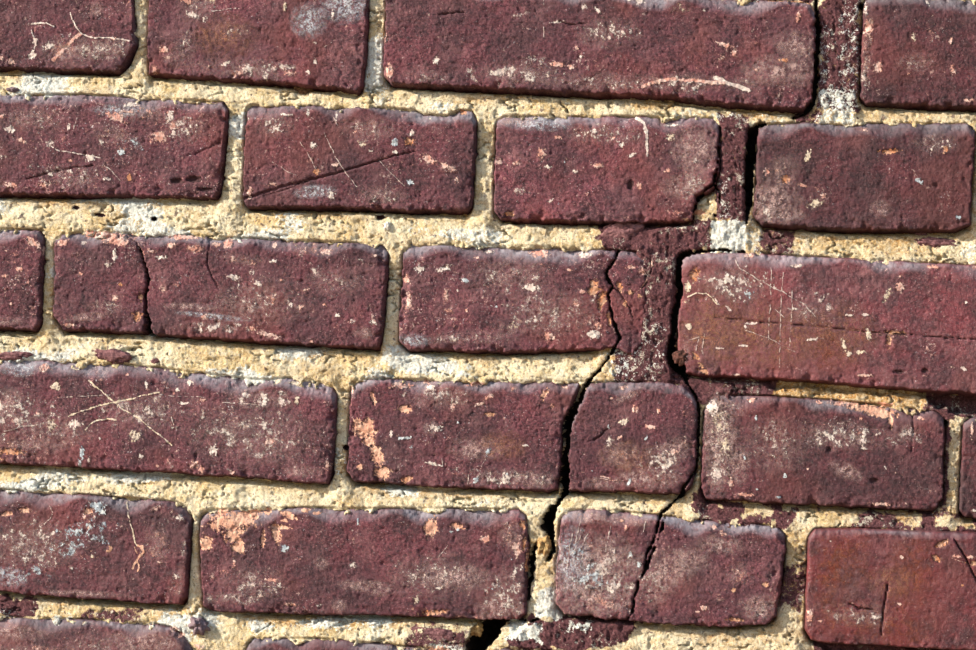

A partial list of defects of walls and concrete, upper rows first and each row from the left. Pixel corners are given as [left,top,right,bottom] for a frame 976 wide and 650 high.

crack [792,0,823,120]
crack [693,127,722,219]
crack [744,123,767,224]
crack [138,246,153,333]
crack [466,251,652,650]
crack [628,248,745,619]